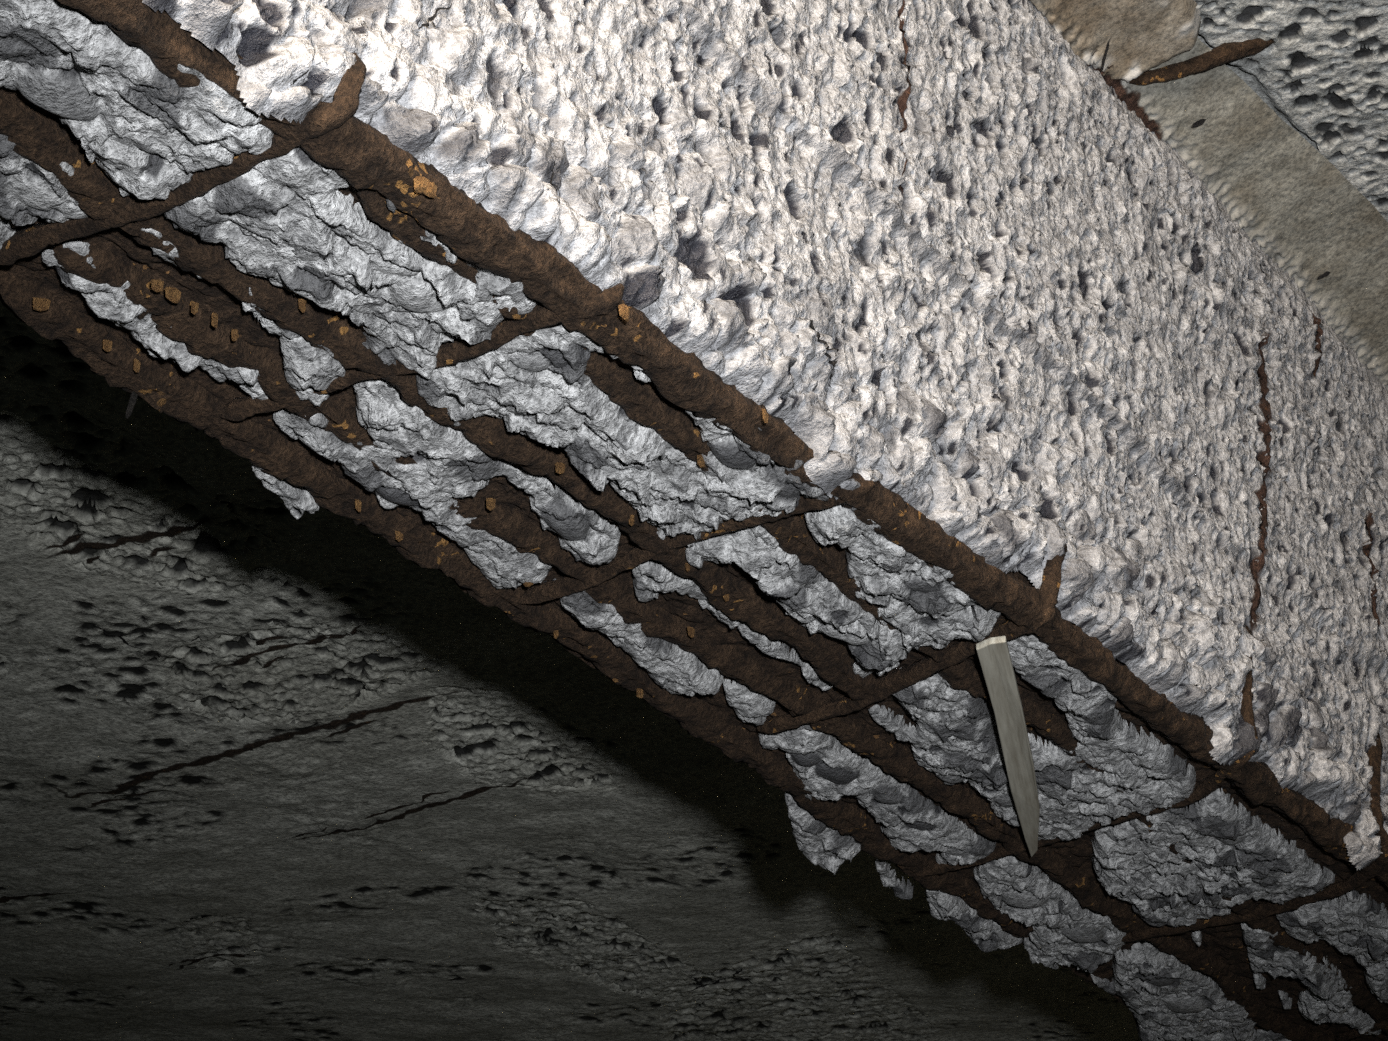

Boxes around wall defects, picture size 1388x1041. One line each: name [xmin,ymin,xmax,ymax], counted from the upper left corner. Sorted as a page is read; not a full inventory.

spalling [0,0,329,249]
corrosion [897,0,911,194]
corrosion [1081,52,1162,141]
spalling [1129,38,1275,86]
corrosion [1313,314,1324,377]
corrosion [1250,324,1272,636]
corrosion [47,517,222,564]
corrosion [1362,512,1381,627]
corrosion [212,625,361,671]
spalling [0,247,1388,1041]
corrosion [54,691,458,808]
corrosion [289,774,549,840]